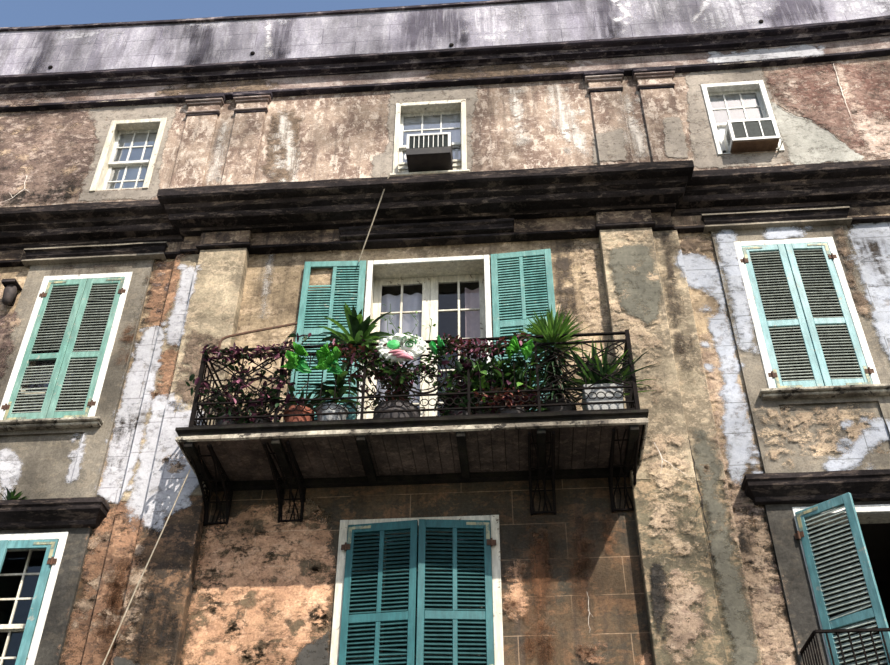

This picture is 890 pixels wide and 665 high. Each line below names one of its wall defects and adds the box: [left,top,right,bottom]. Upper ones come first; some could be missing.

leakage [33,30,122,72]
leakage [187,22,229,65]
leakage [265,17,291,60]
leakage [404,7,531,48]
leakage [597,0,619,37]
leakage [700,0,823,29]
peeling [765,60,890,159]
peeling [151,329,224,410]
peeling [749,400,876,474]
peeling [638,430,711,555]
peeling [696,333,800,665]
peeling [650,563,714,663]